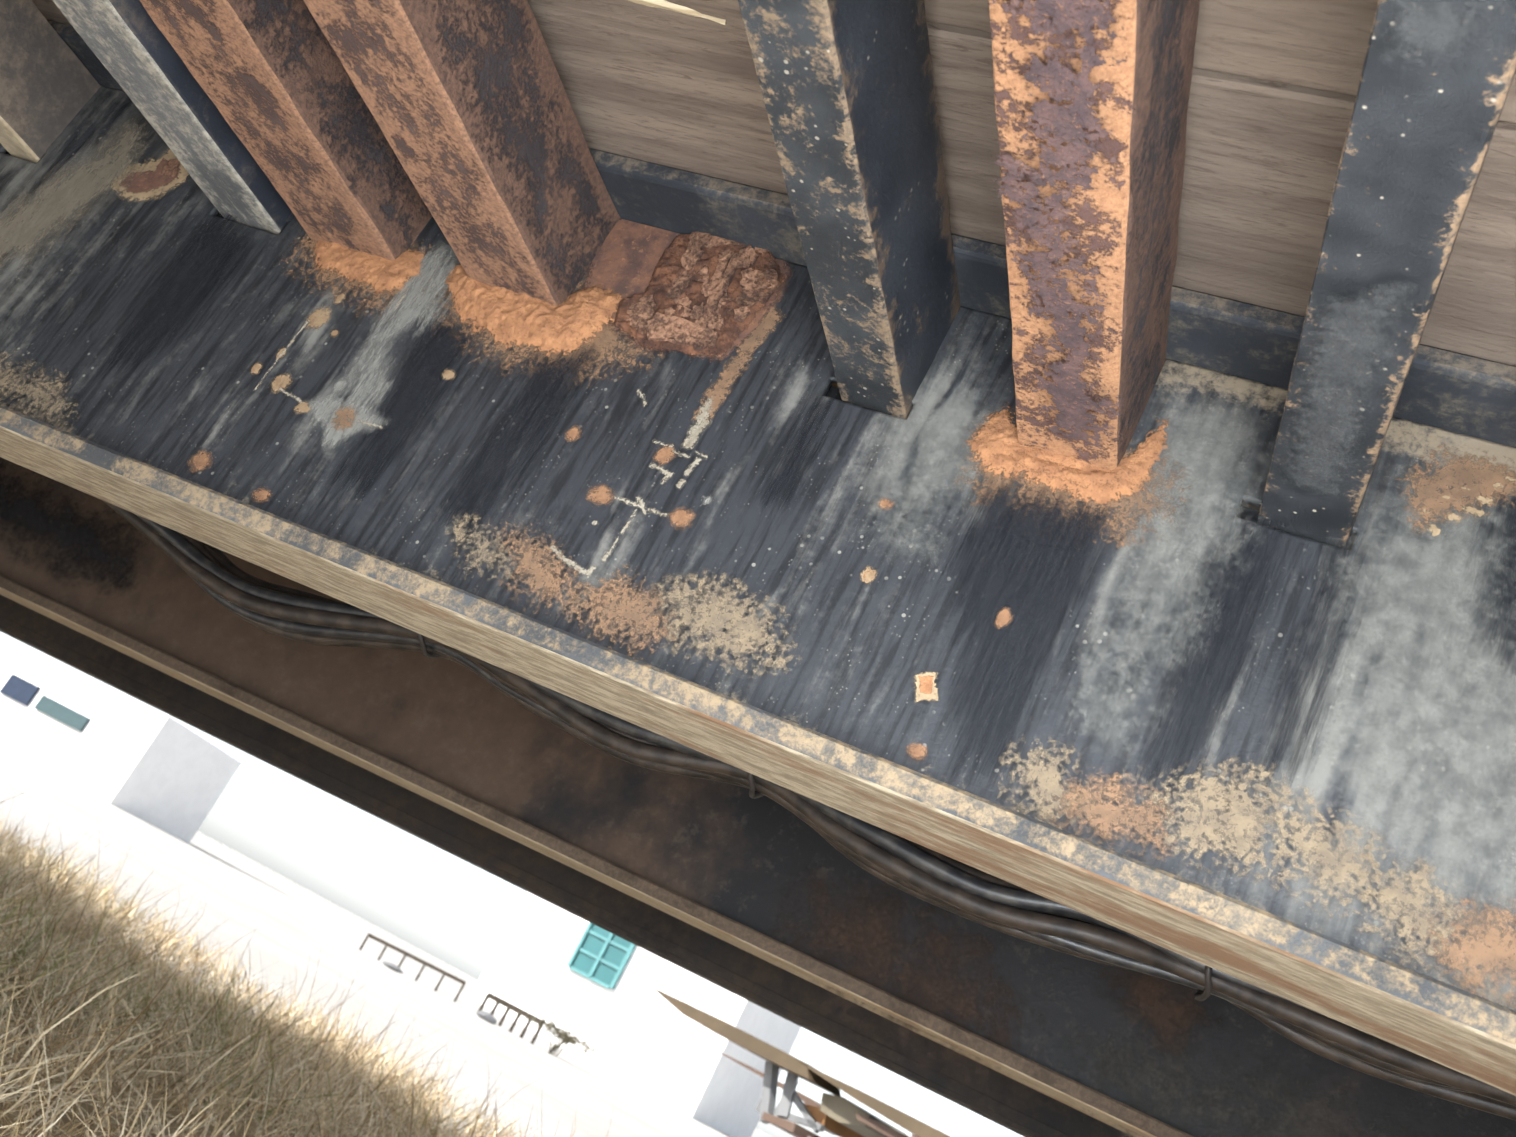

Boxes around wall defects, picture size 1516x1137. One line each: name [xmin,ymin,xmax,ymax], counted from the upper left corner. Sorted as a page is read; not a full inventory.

damp [109,214,247,366]
damp [309,247,467,492]
damp [449,349,592,522]
rust [283,219,791,465]
rust [496,523,677,656]
damp [953,487,1105,772]
damp [1144,516,1270,780]
damp [1266,538,1365,780]
damp [1477,498,1516,666]
rust [1045,772,1175,859]
rust [1417,898,1516,1007]